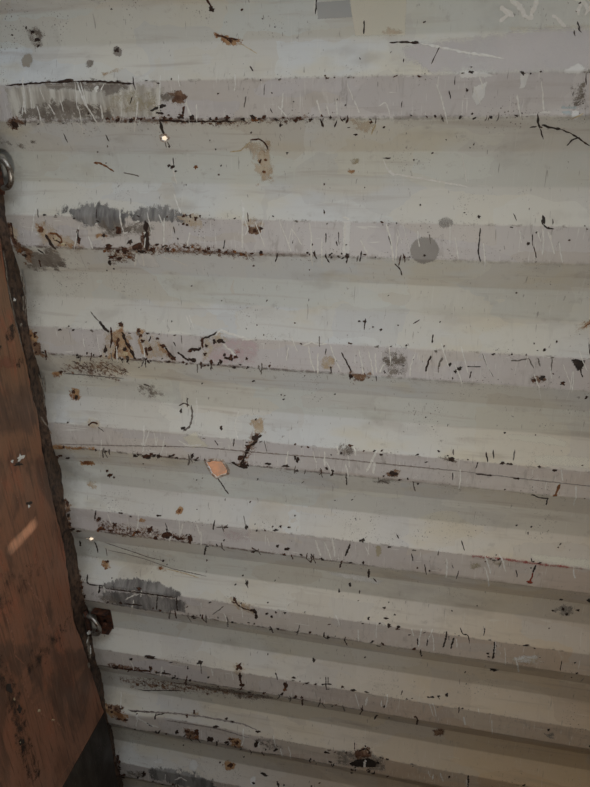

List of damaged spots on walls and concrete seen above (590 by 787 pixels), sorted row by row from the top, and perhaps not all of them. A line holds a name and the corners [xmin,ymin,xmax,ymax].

rust [214,33,256,53]
rust [105,90,313,128]
rust [231,138,274,186]
rust [90,311,259,365]
rust [94,512,195,544]